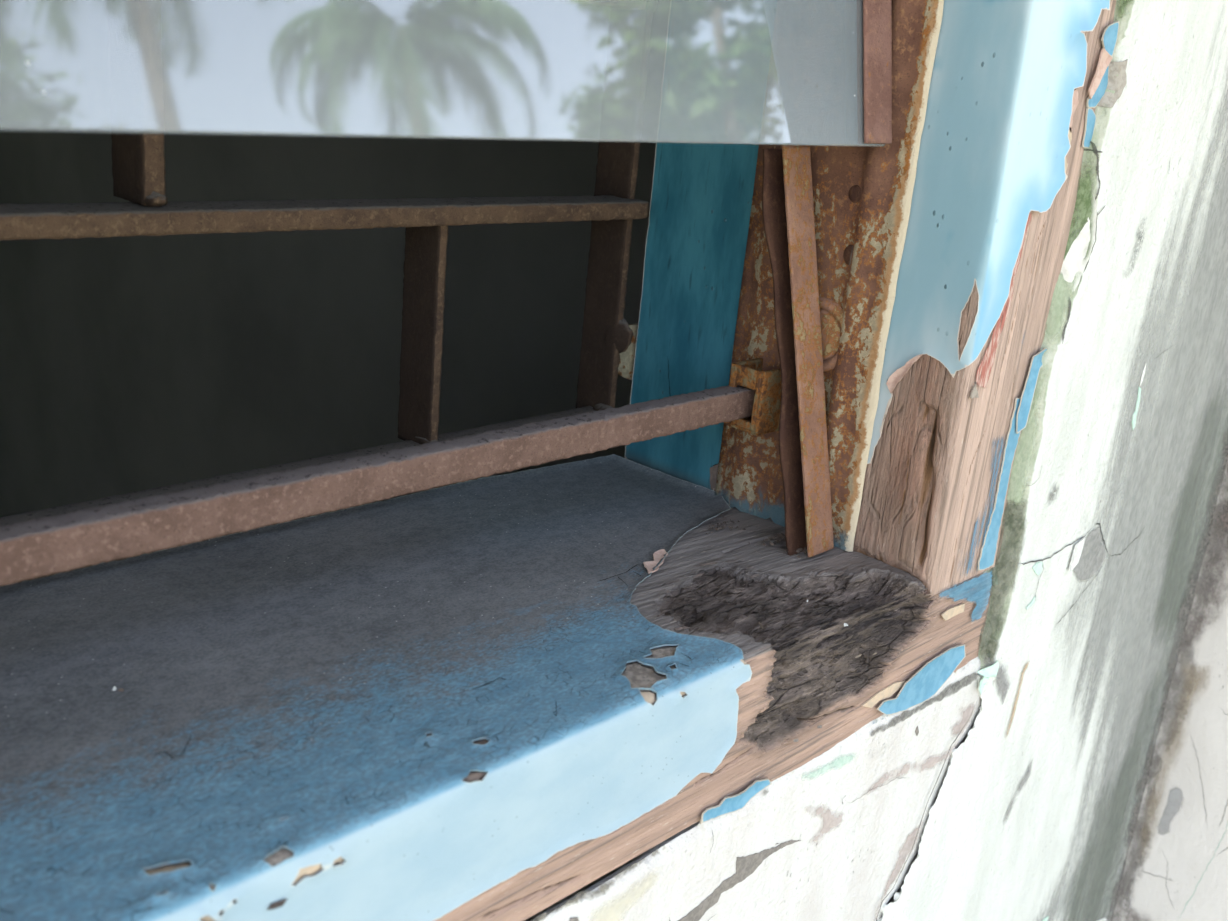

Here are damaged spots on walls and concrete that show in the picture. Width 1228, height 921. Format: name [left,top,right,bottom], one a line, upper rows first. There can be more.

spalling [1068,21,1128,148]
peeling [970,213,1032,398]
peeling [643,549,668,573]
peeling [940,348,1048,621]
crack [1018,523,1145,623]
spalling [1068,528,1106,581]
leakage [1042,92,1228,921]
peeling [861,644,965,715]
peeling [265,849,344,884]
peeling [700,779,772,824]
spalling [678,840,801,921]
crack [1140,733,1228,917]